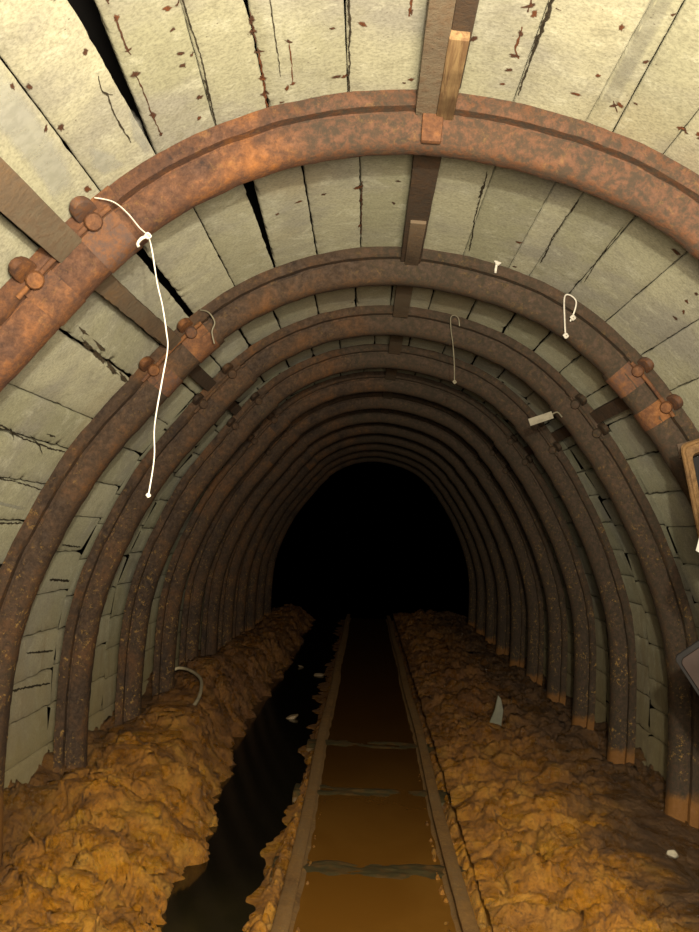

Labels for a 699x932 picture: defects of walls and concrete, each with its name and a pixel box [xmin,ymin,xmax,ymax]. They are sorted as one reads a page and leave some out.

corrosion [114,15,132,55]
corrosion [249,12,269,108]
crack [270,0,281,76]
crack [518,0,554,95]
crack [98,76,131,142]
corrosion [131,71,163,136]
crack [0,424,65,452]
crack [0,478,42,490]
crack [13,683,50,692]